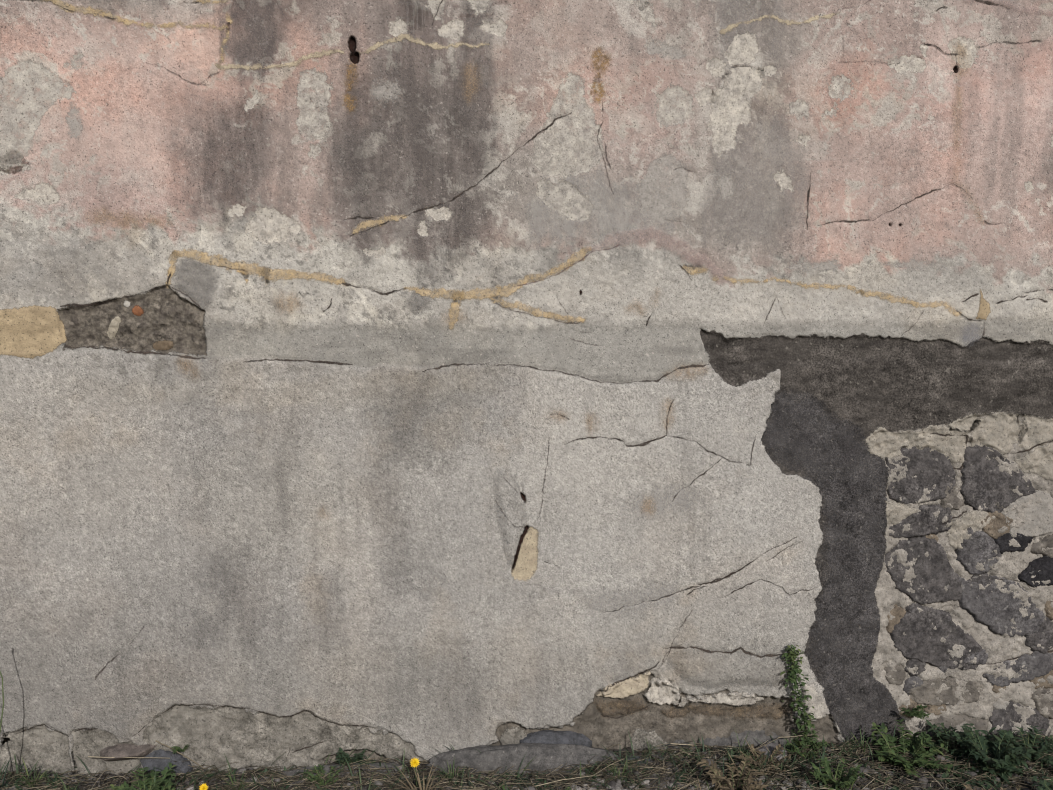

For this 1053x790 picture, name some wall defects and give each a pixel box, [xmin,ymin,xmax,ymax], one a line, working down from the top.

crack [344,112,572,236]
crack [806,176,972,228]
spalling [57,285,207,357]
crack [323,283,406,312]
crack [245,358,353,366]
crack [422,363,709,384]
crack [497,402,756,527]
flaking render [489,328,1053,751]
crack [599,537,817,719]
spalling [0,704,424,777]